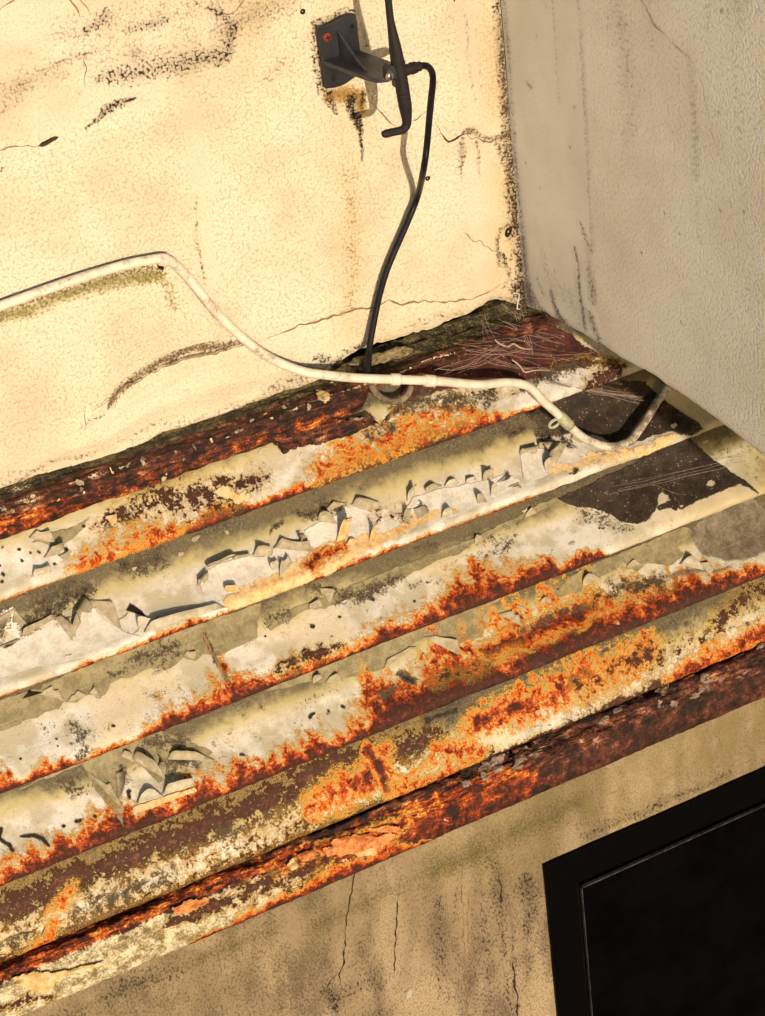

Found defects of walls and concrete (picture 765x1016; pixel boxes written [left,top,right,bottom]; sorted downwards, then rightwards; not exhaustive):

crack [0,136,59,151]
water stain [85,3,238,130]
crack [370,102,503,143]
water stain [459,0,604,351]
water stain [89,340,241,421]
rust [0,326,627,602]
rust [0,484,566,698]
peeling [0,381,765,733]
spalling [0,827,50,852]
peeling [18,731,217,827]
rust [0,546,765,962]
crack [327,874,355,988]